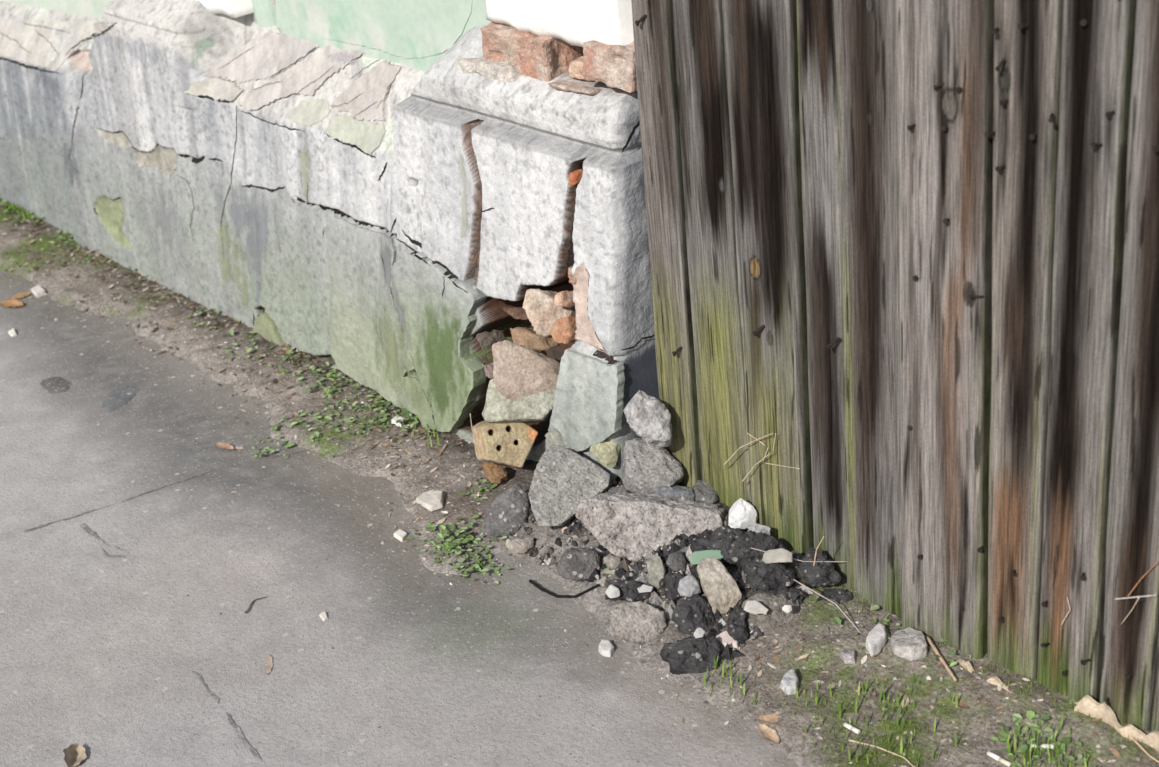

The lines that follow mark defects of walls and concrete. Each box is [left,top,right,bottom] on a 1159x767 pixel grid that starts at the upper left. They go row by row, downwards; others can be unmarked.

crack [0,33,97,173]
peeling [0,19,117,74]
peeling [184,31,402,156]
spalling [458,22,637,94]
spalling [97,129,178,176]
spalling [94,196,132,249]
crack [107,93,494,306]
crack [565,160,584,284]
water stain [384,247,404,332]
spalling [476,264,610,378]
crack [192,671,262,761]